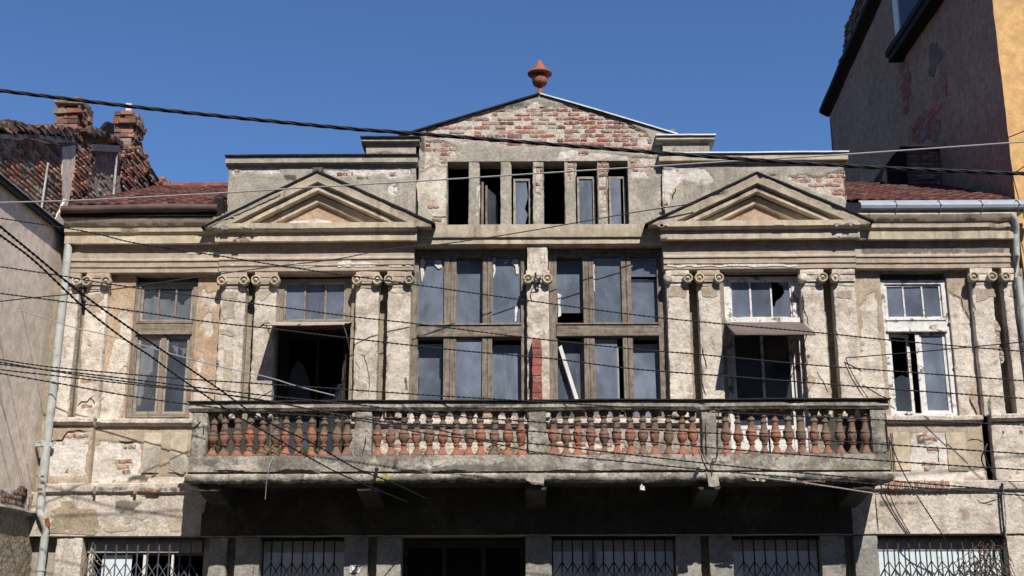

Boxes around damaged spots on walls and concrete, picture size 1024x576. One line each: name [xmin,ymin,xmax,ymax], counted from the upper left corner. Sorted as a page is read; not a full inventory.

flaking render [901,42,948,145]
flaking render [327,102,713,222]
flaking render [790,171,847,200]
peeling [200,289,238,337]
peeling [49,431,186,494]
peeling [884,432,988,489]
flaking render [0,485,33,510]